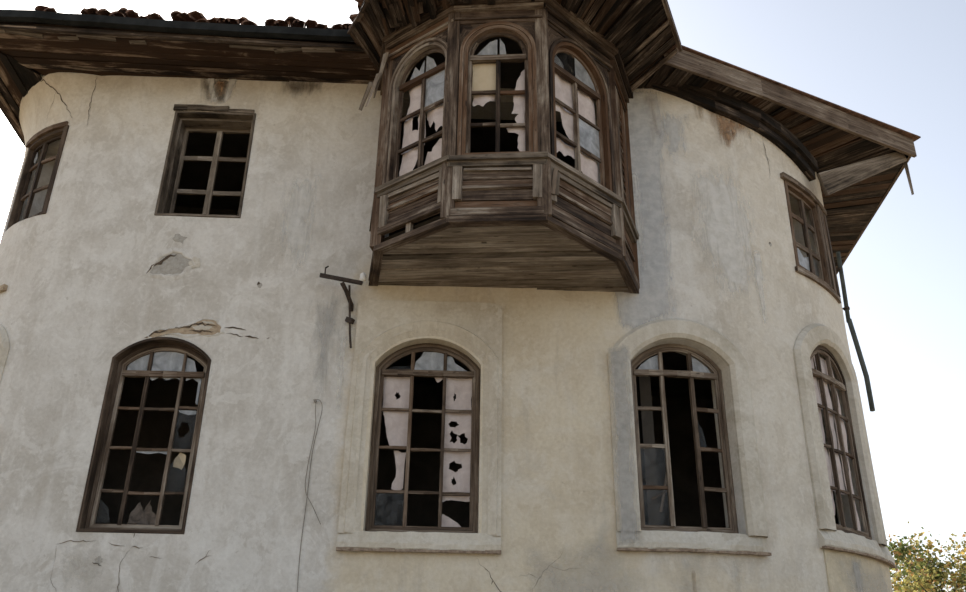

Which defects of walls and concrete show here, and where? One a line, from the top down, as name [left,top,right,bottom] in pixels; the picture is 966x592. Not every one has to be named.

crack [41,79,96,125]
flaking render [144,234,200,280]
flaking render [145,317,226,339]
crack [50,533,157,592]